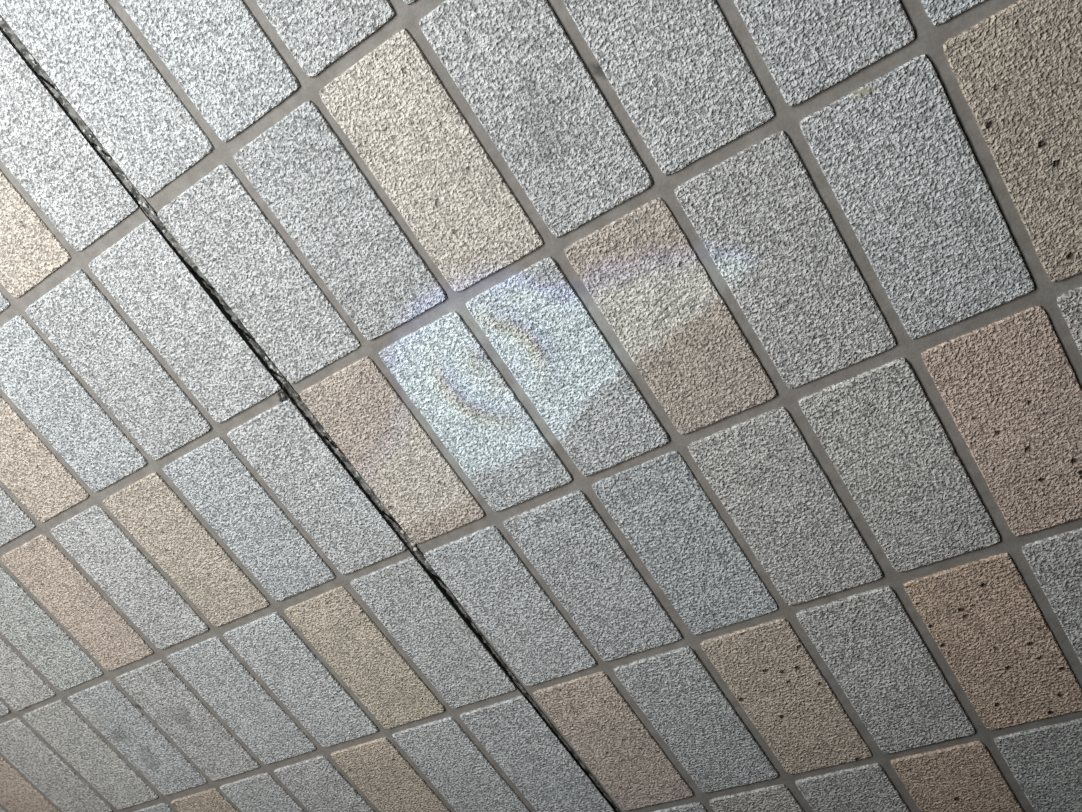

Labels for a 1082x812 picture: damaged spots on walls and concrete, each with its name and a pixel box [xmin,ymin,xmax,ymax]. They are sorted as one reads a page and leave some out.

crack [0,29,617,812]